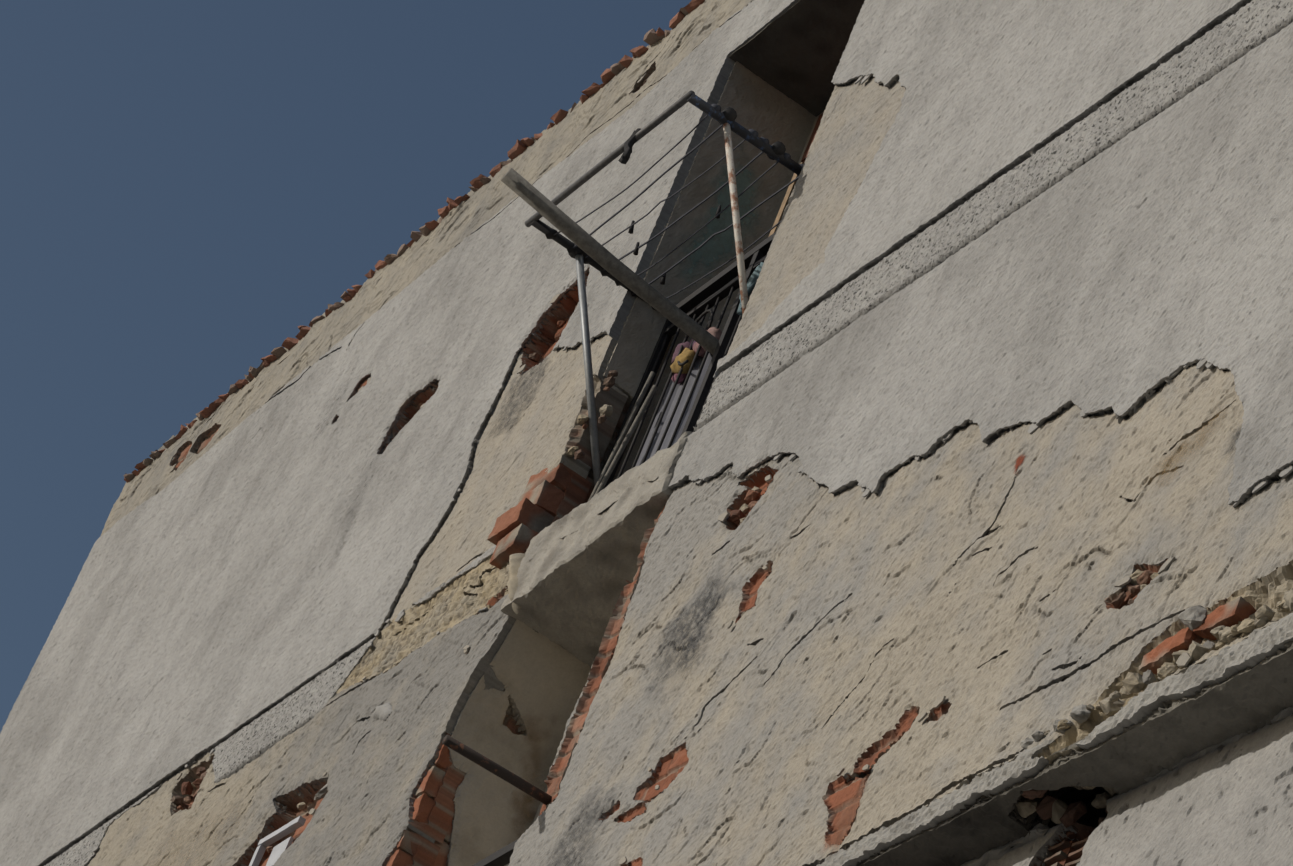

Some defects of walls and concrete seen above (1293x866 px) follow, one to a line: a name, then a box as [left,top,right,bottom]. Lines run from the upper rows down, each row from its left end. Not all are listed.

flaking render [88,273,631,866]
flaking render [508,359,1293,866]
crack [977,515,1001,554]